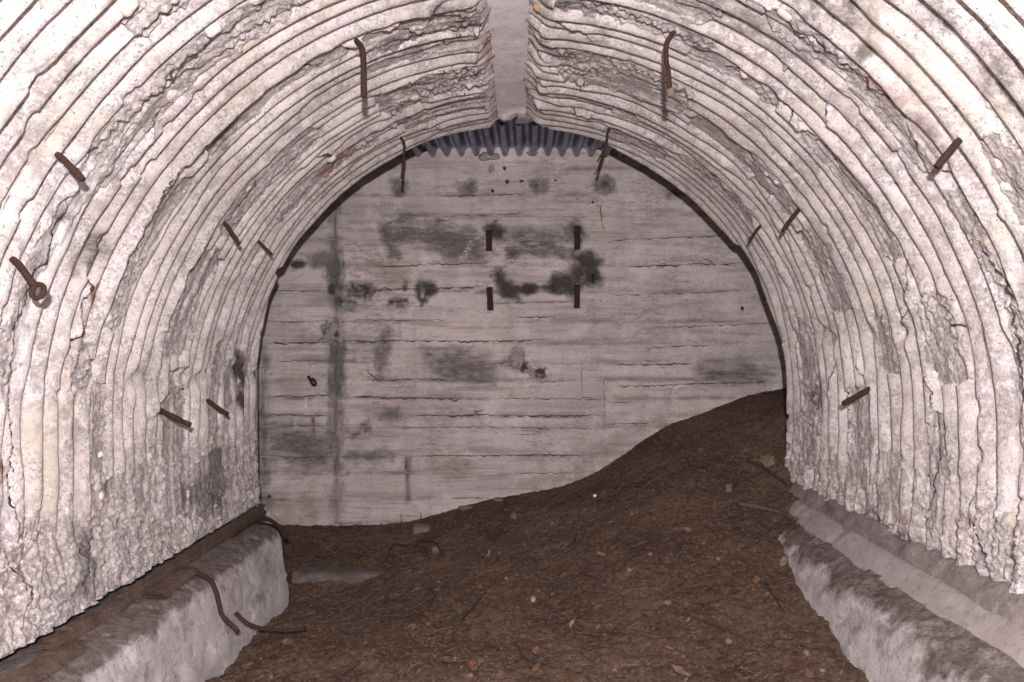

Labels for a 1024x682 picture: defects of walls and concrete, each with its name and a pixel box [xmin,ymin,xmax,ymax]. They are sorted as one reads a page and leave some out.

spalling [205,4,494,179]
spalling [552,0,852,315]
water stain [291,206,375,328]
water stain [389,282,437,306]
water stain [381,217,481,260]
water stain [576,251,602,279]